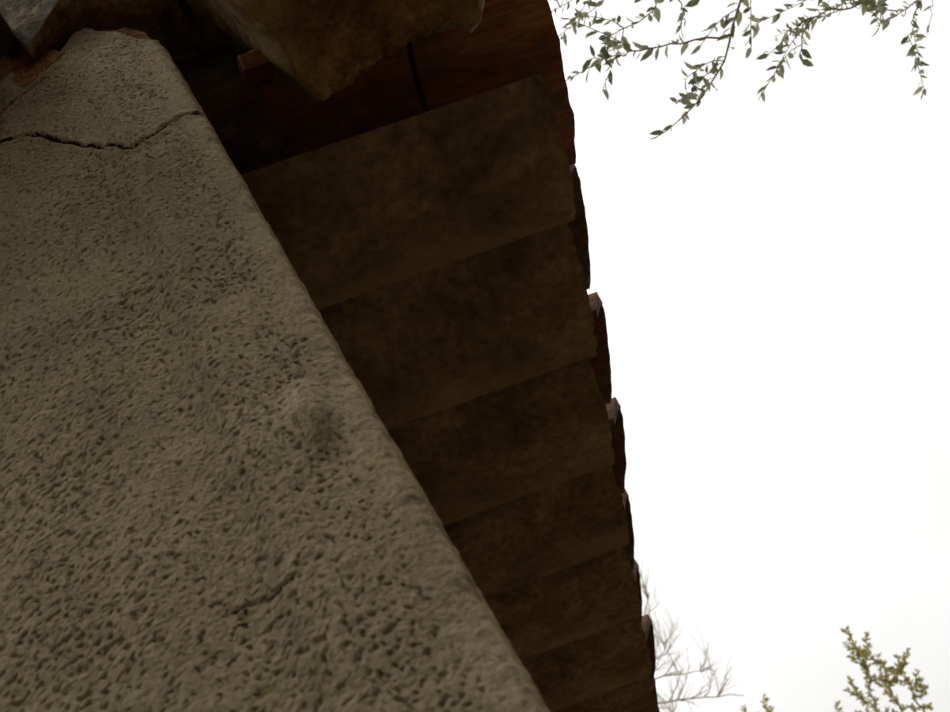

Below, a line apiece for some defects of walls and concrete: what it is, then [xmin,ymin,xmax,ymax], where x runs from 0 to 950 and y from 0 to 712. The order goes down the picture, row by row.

crack [0,114,192,150]